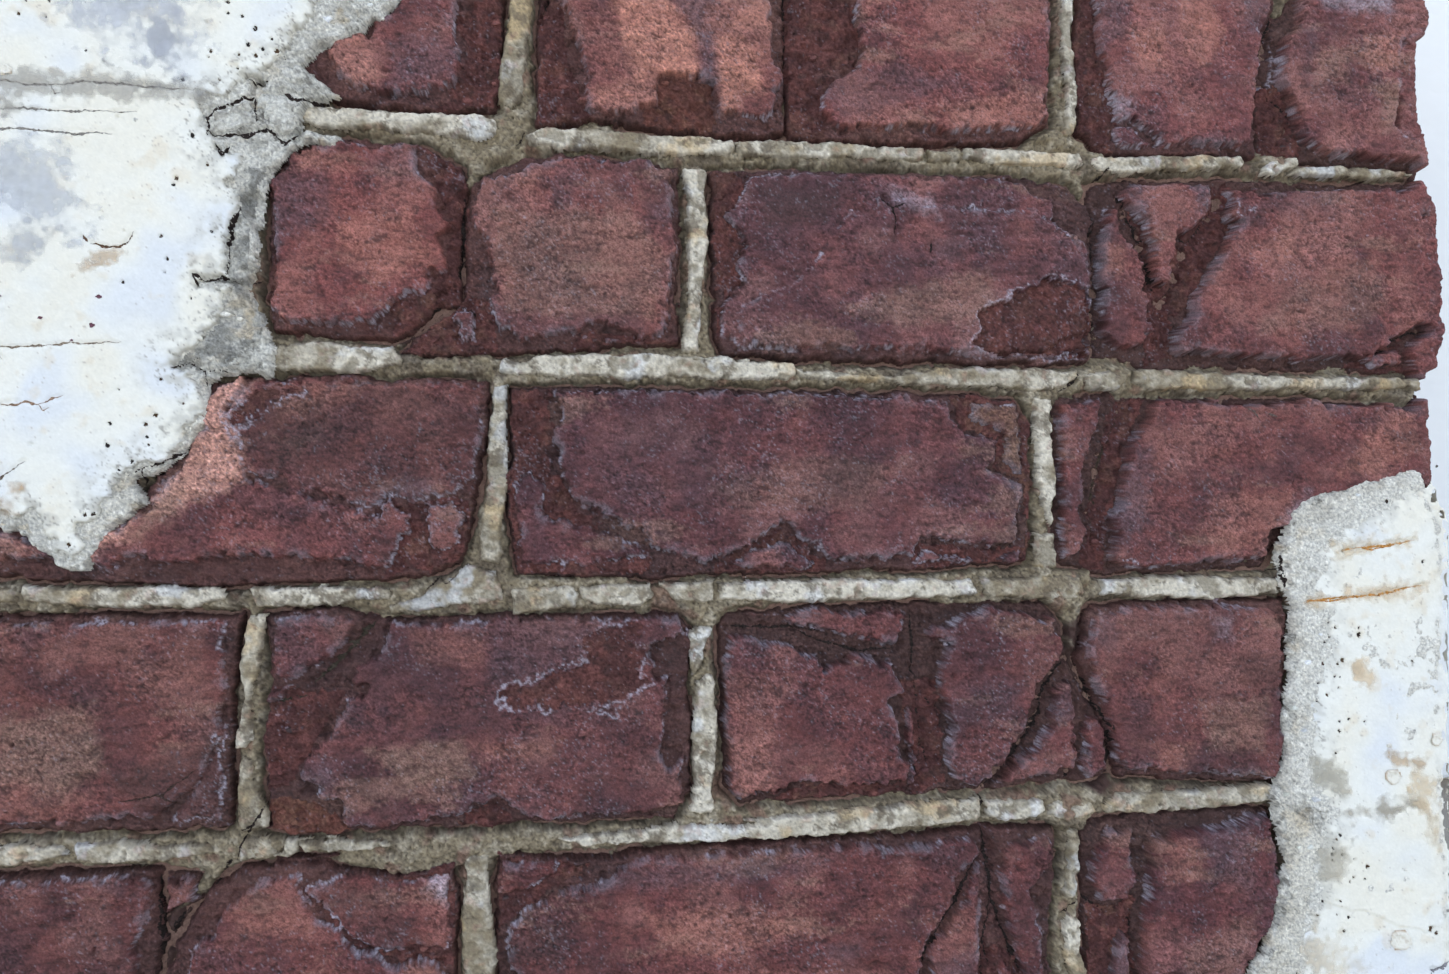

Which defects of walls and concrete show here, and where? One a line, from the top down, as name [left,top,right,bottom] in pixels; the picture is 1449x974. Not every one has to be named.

spalling [226,0,390,76]
spalling [436,0,503,113]
spalling [780,0,860,140]
spalling [1071,0,1117,154]
spalling [177,166,266,396]
spalling [973,276,1091,359]
spalling [1125,183,1231,368]
spalling [499,622,649,711]
spalling [1257,471,1424,974]
crack [216,801,269,884]
crack [157,874,187,971]
spalling [303,862,458,966]